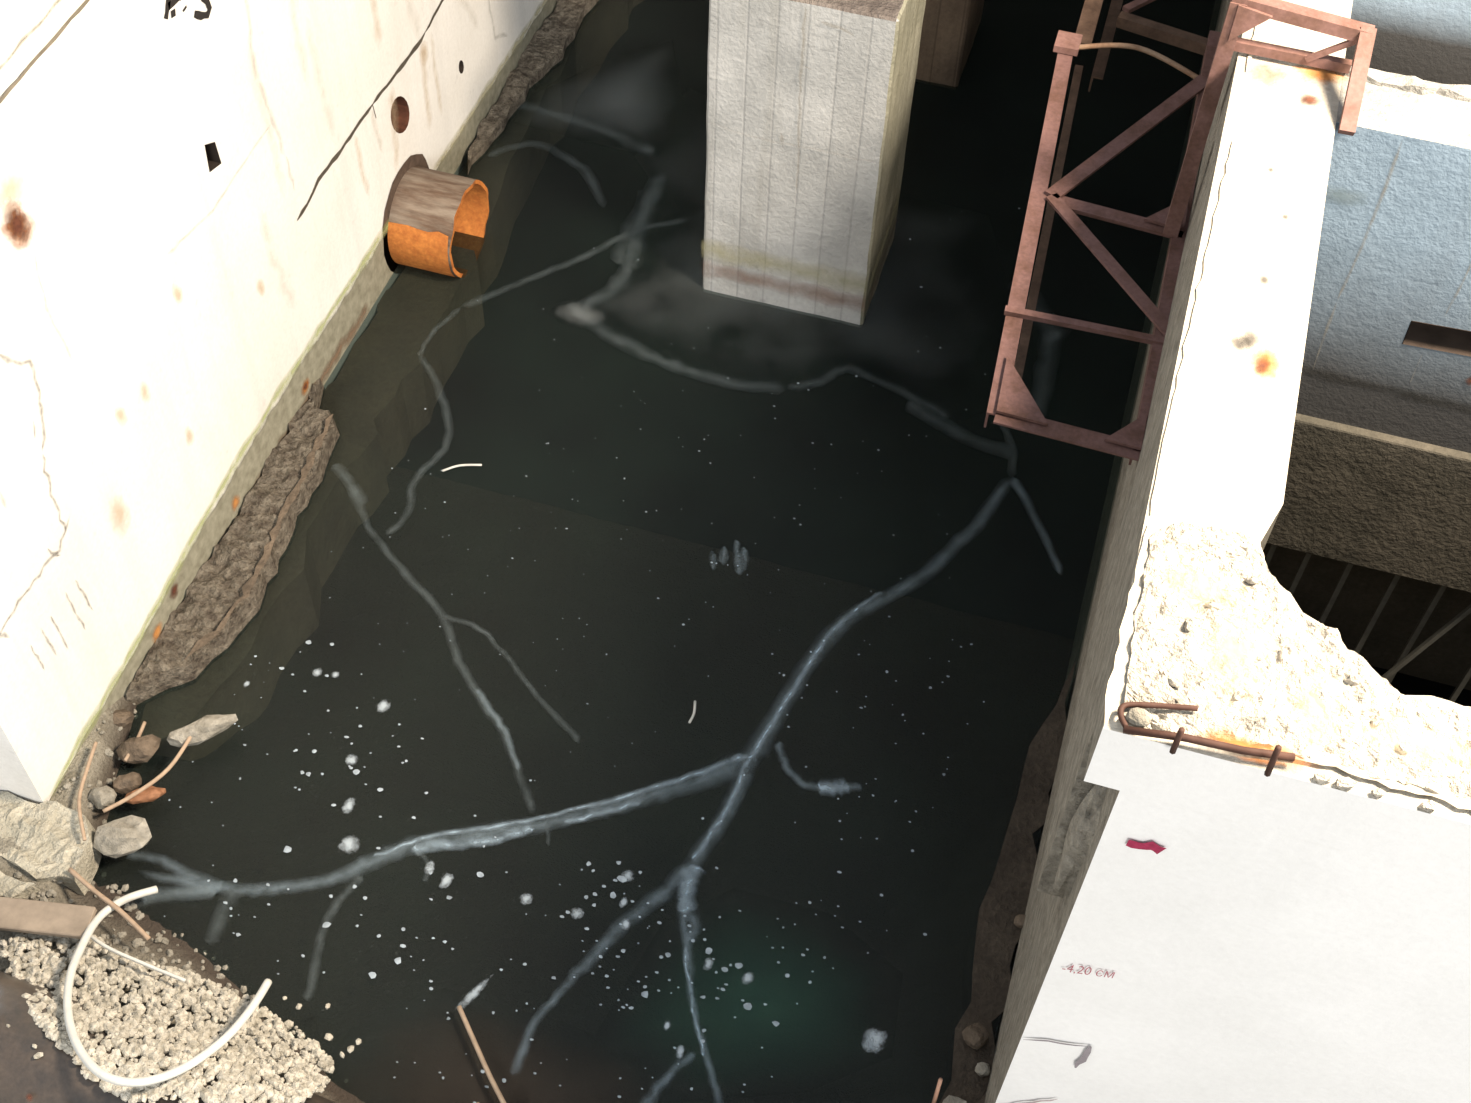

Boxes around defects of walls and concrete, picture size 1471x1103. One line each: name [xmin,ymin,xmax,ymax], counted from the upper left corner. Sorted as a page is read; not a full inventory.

crack [297,0,444,221]
rust [5,208,31,245]
spalling [1105,139,1471,812]
rust [1208,733,1298,765]